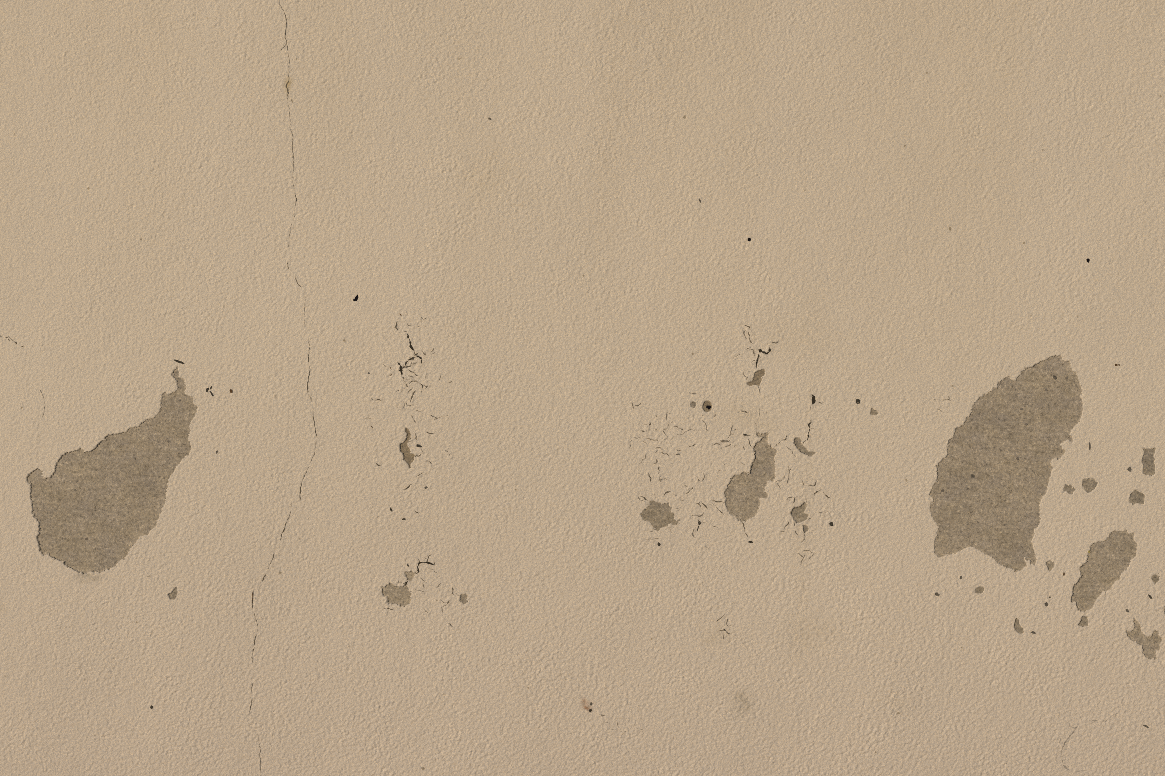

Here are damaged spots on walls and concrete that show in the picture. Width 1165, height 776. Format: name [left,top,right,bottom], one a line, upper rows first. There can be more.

peeling [27,367,198,574]
peeling [400,428,415,468]
peeling [724,433,777,522]
peeling [929,355,1083,572]
peeling [1064,478,1098,494]
peeling [640,501,680,531]
peeling [382,571,416,607]
peeling [1071,530,1138,627]
peeling [1126,619,1162,659]